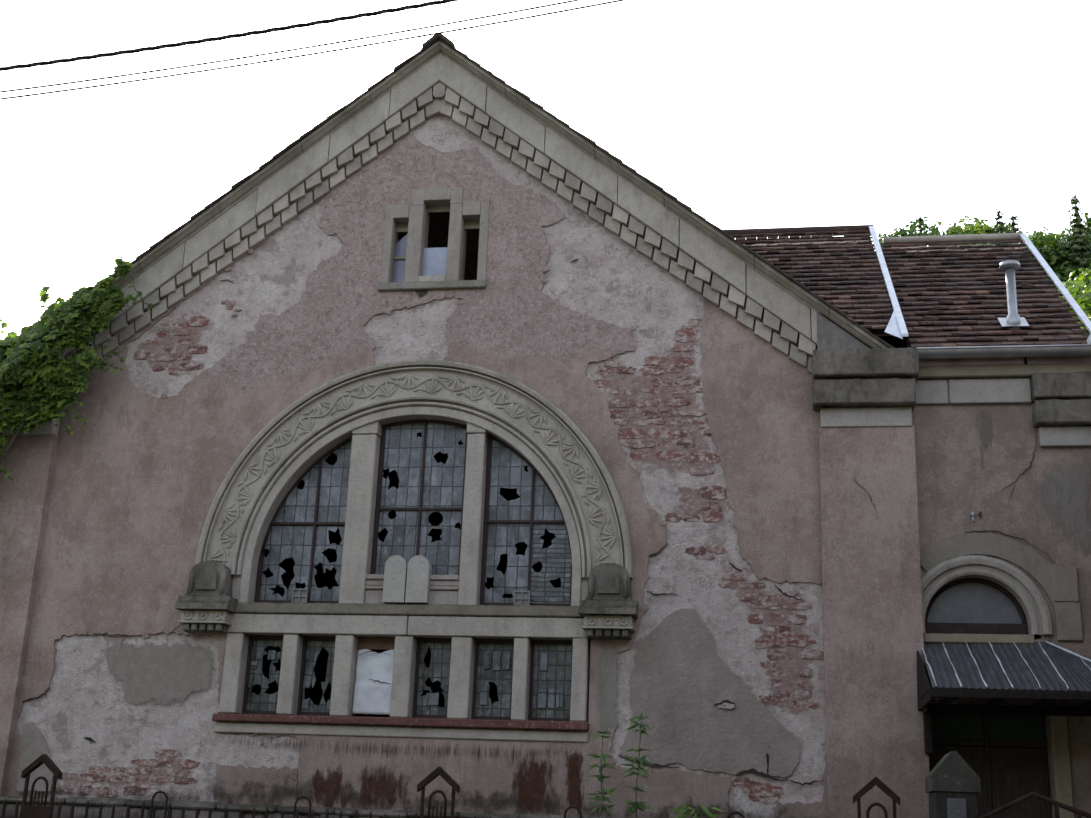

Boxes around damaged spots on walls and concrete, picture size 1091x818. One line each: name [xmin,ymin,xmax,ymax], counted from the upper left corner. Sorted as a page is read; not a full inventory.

peeling [125,200,343,399]
peeling [364,291,465,365]
peeling [413,115,826,818]
crack [964,431,1057,565]
peeling [17,631,299,802]
leakage [135,750,611,817]